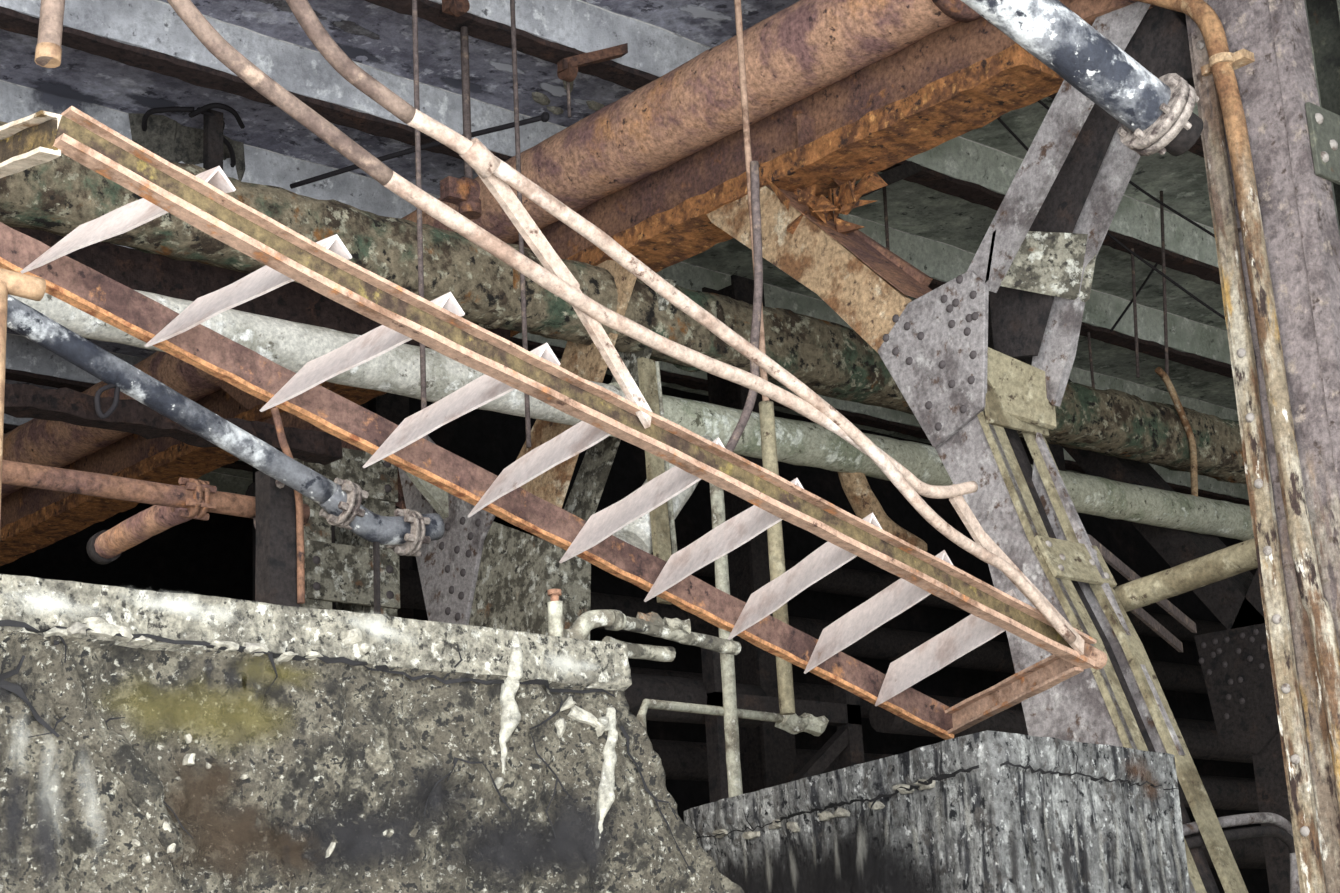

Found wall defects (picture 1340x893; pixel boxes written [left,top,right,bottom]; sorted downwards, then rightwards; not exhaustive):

leakage [205,658,290,728]
crack [0,619,1178,875]